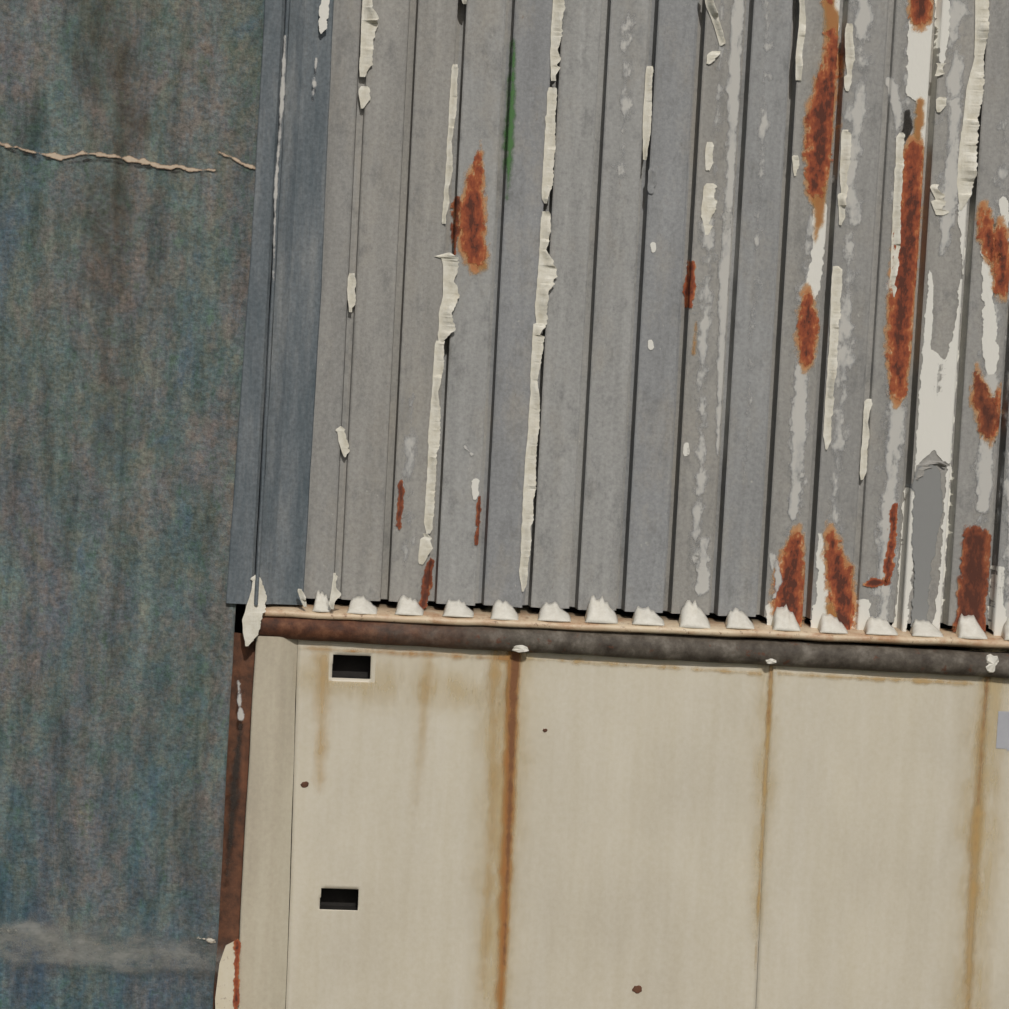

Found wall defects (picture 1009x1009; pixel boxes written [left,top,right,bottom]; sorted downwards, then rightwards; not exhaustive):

crack [0,142,256,173]
peeling [402,252,460,565]
corrosion [450,151,489,274]
peeling [519,0,565,592]
corrosion [802,0,844,240]
peeling [795,0,874,628]
corrosion [883,98,925,409]
peeling [851,0,990,632]
peeling [978,245,1009,400]
corrosion [770,523,806,627]
corrosion [953,525,992,632]
corrosion [483,651,521,1009]